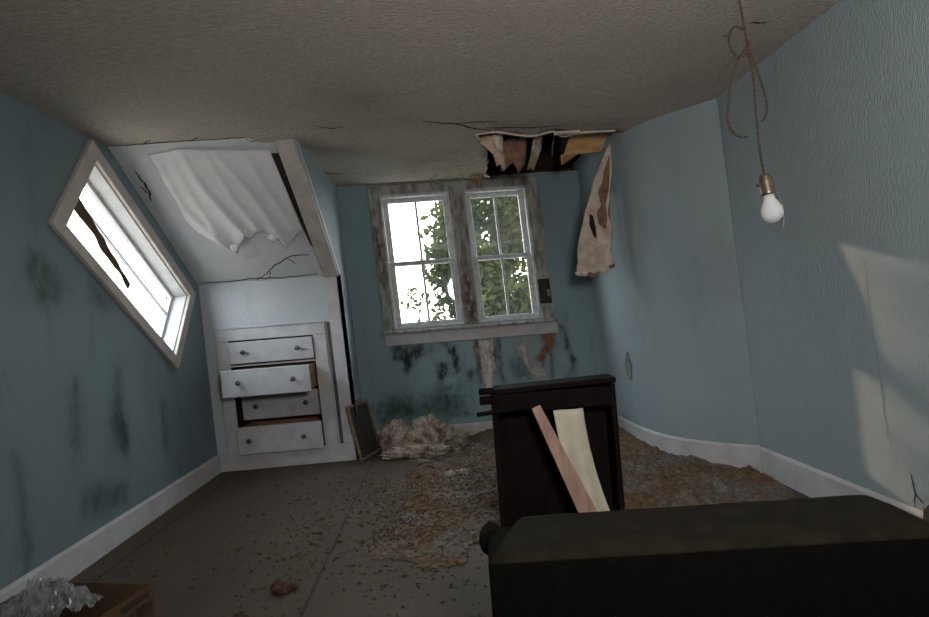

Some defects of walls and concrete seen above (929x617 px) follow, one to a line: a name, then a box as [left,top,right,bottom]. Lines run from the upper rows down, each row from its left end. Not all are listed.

leakage [398,346,423,370]
leakage [437,344,458,379]
leakage [468,338,503,388]